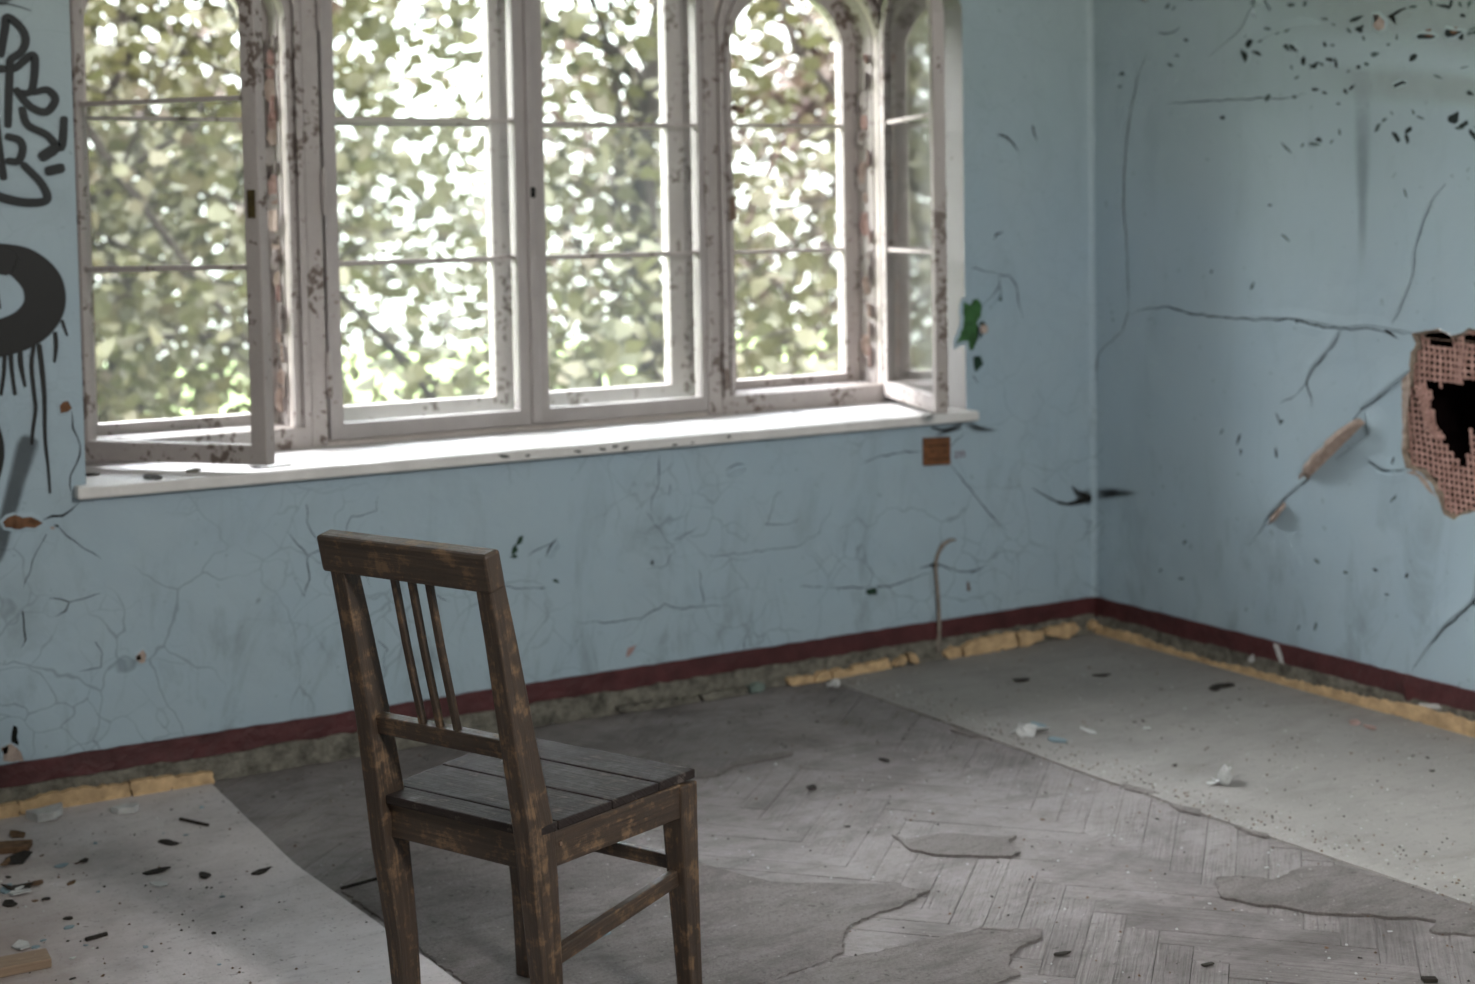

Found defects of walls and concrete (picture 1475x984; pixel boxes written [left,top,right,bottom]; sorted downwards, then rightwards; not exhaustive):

peeling [1238,0,1475,105]
peeling [1281,128,1341,154]
peeling [1374,109,1424,143]
peeling [1448,111,1475,140]
crack [1096,27,1413,544]
spalling [1401,328,1475,520]
crack [22,414,100,645]
crack [289,496,379,597]
crack [1409,527,1475,671]